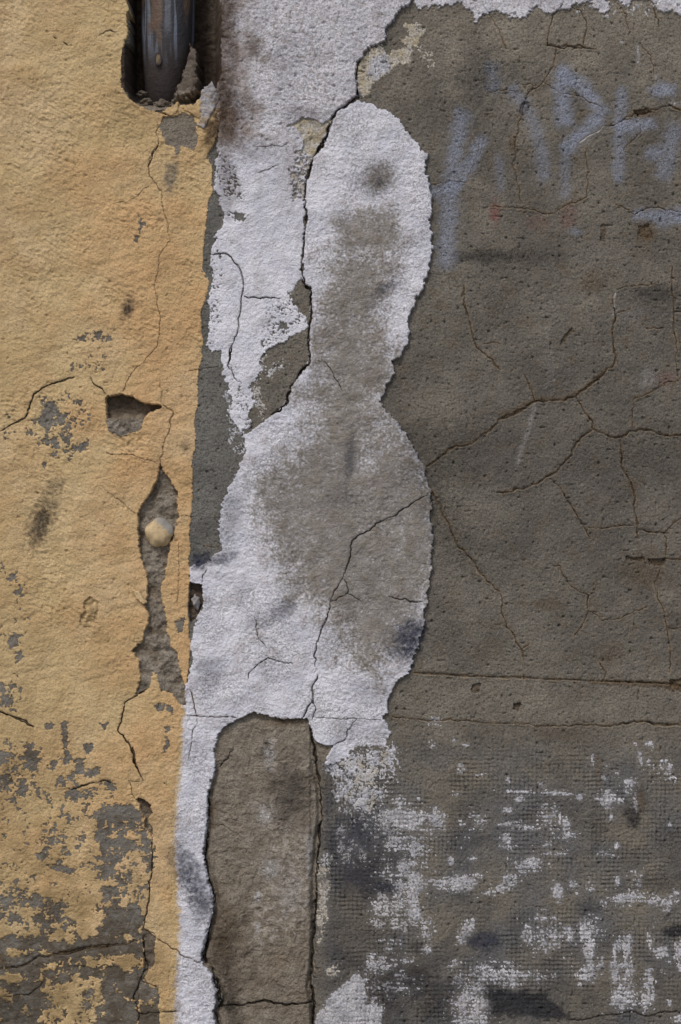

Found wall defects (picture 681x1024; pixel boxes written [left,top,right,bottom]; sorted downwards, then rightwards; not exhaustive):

spalling [120,0,224,154]
peeling [355,22,435,98]
crack [487,5,681,214]
crack [1,129,170,431]
peeling [4,393,91,469]
spalling [106,395,162,437]
peeling [222,291,307,455]
spalling [133,466,204,753]
crack [0,253,681,1024]
peeling [0,721,160,1024]
water stain [485,989,570,1019]
water stain [664,915,681,937]